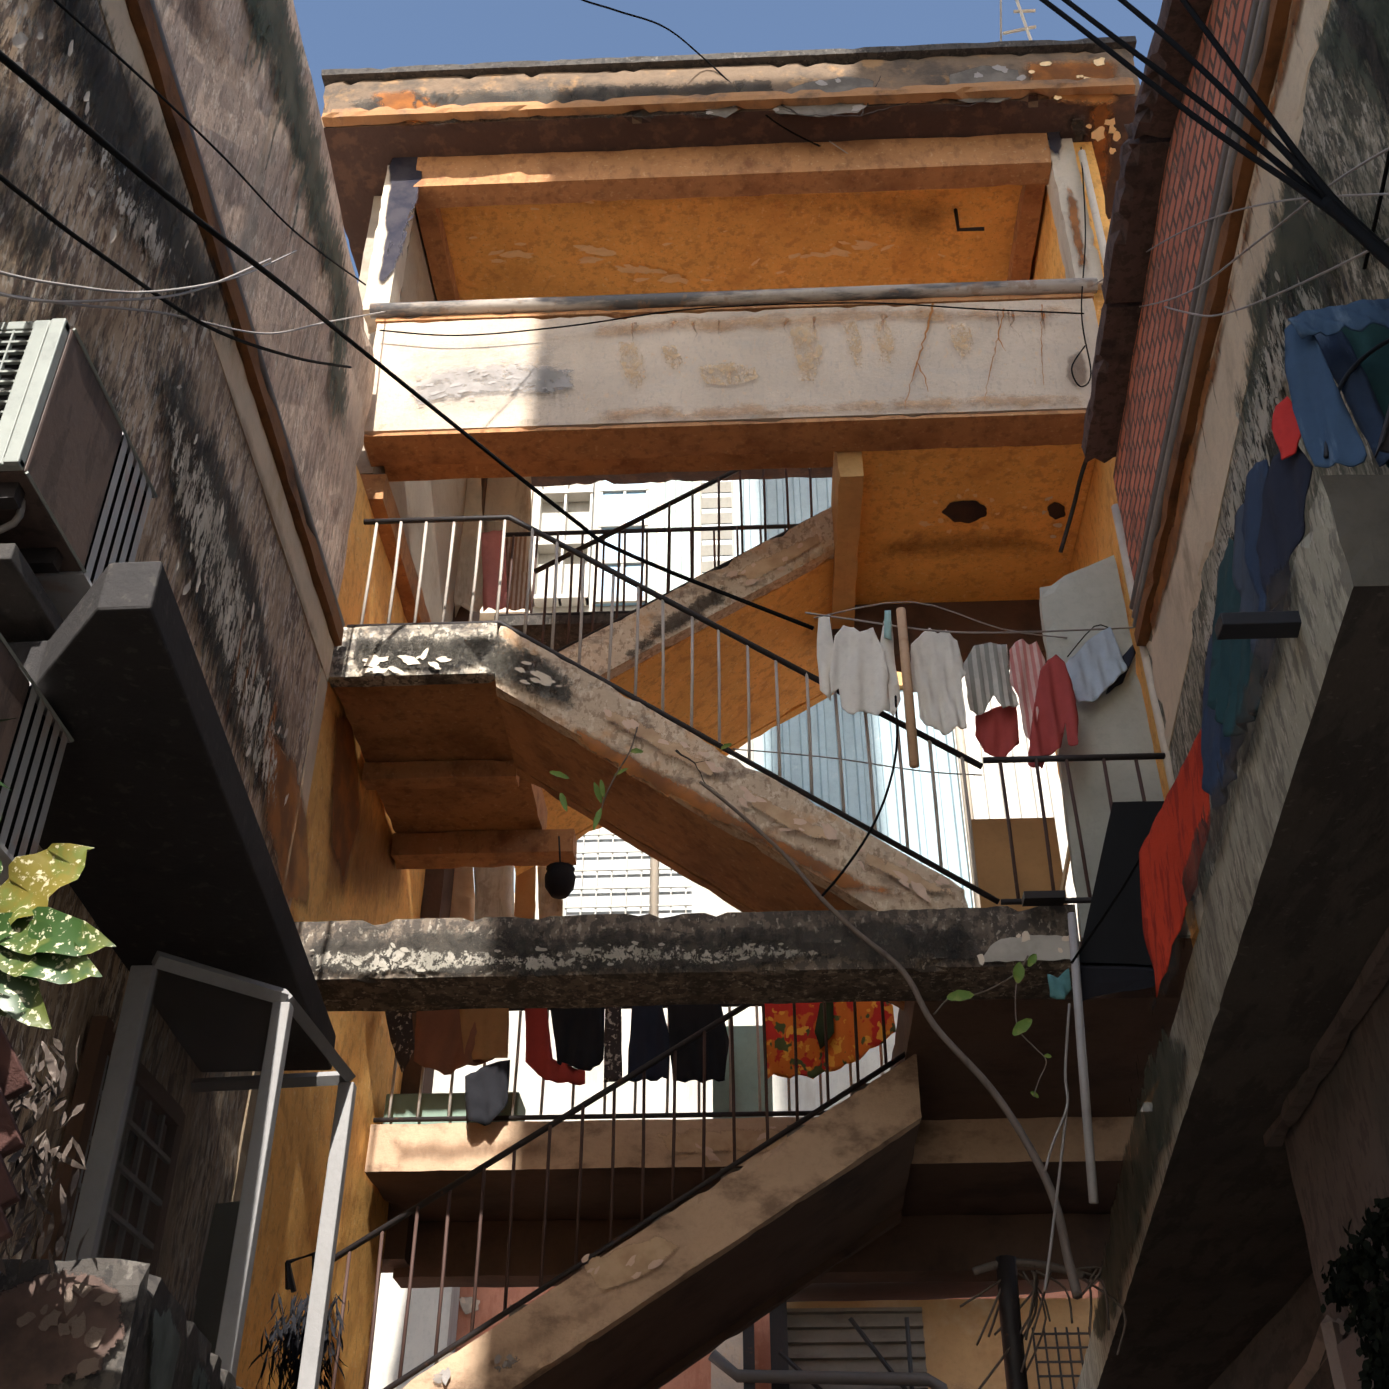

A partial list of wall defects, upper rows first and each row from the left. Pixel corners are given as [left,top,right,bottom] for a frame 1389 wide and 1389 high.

spalling [773,76,874,117]
water stain [25,0,238,341]
water stain [244,0,350,436]
water stain [379,157,422,282]
crack [905,303,935,404]
crack [984,308,1006,400]
crack [1038,304,1046,384]
water stain [144,330,287,801]
peeling [360,635,571,701]
peeling [310,940,842,975]
peeling [977,931,1071,966]
peeling [0,1270,125,1389]